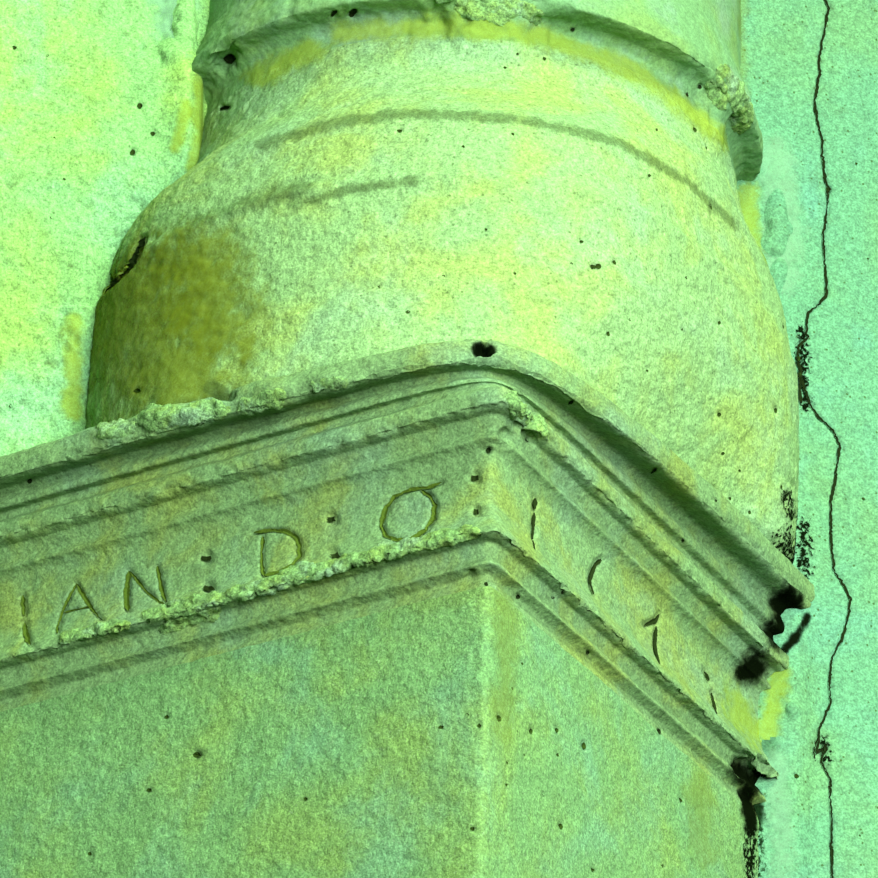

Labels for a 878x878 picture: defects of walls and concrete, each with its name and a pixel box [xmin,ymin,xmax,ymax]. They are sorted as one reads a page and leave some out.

spalling [434,0,544,26]
spalling [698,63,754,135]
crack [796,0,852,878]
mould [768,486,820,579]
leakage [735,584,811,683]
leakage [730,760,765,878]